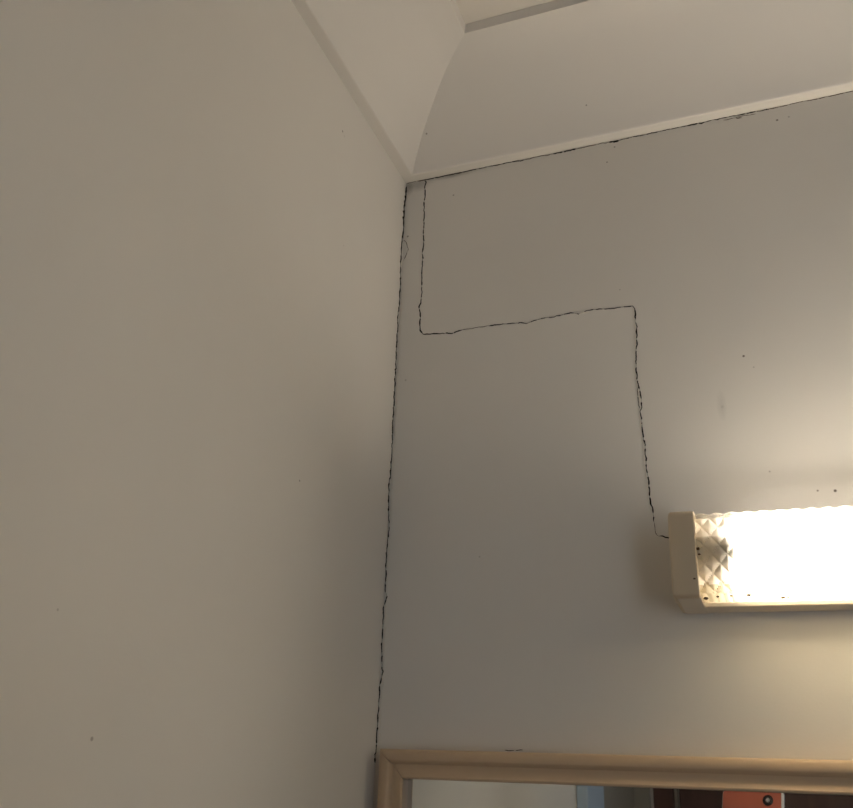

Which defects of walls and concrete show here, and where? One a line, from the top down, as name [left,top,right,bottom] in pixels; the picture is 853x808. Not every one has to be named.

crack [374,91,853,762]